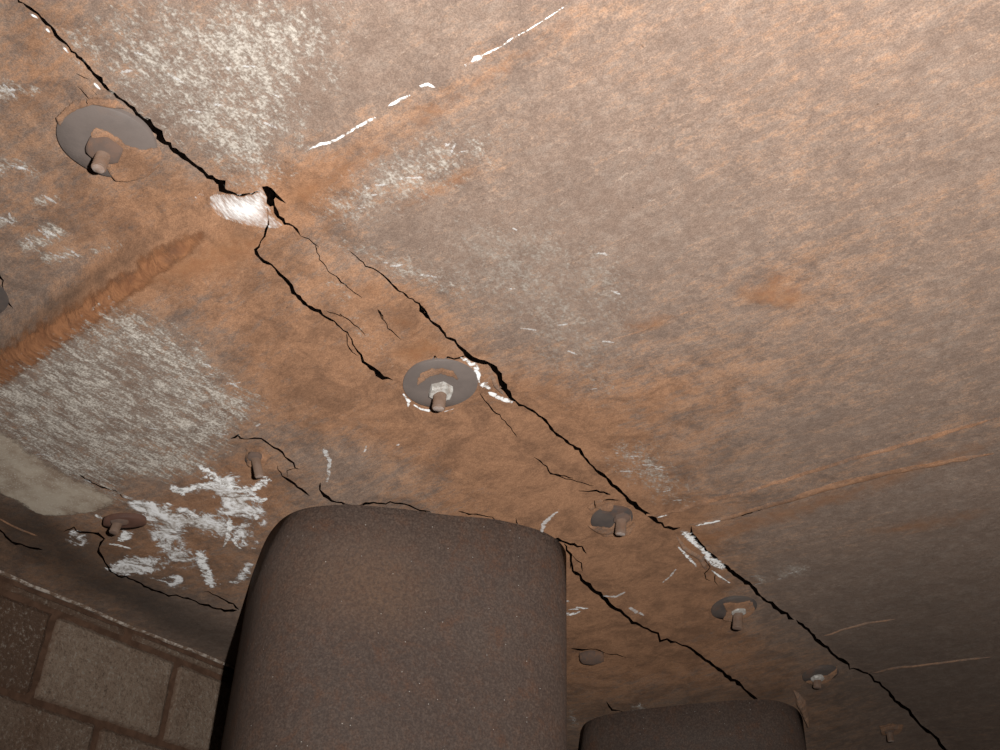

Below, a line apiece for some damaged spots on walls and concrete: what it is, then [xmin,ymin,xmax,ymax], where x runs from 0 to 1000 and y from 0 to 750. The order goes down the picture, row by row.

efflorescence [471,7,563,62]
efflorescence [109,0,325,227]
efflorescence [298,117,375,149]
crack [18,0,400,380]
spalling [262,186,285,207]
efflorescence [363,146,456,206]
crack [73,473,124,498]
efflorescence [0,303,272,588]
crack [231,434,430,512]
crack [350,251,947,750]
crack [0,530,42,550]
crack [63,527,239,612]